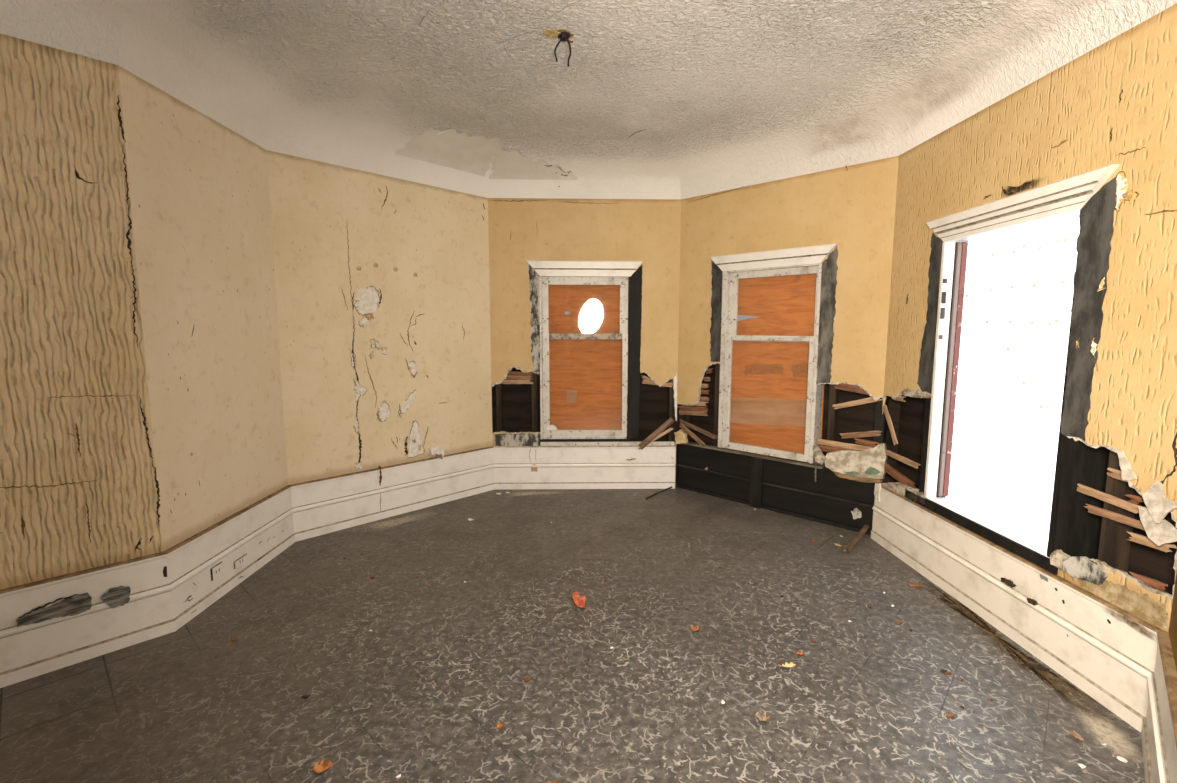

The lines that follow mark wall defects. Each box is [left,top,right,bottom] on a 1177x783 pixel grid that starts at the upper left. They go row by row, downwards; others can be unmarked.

peeling [349,285,388,434]
peeling [376,361,445,459]
flaking render [640,260,723,446]
flaking render [816,233,947,504]
flaking render [1040,171,1177,630]
spalling [16,586,131,627]